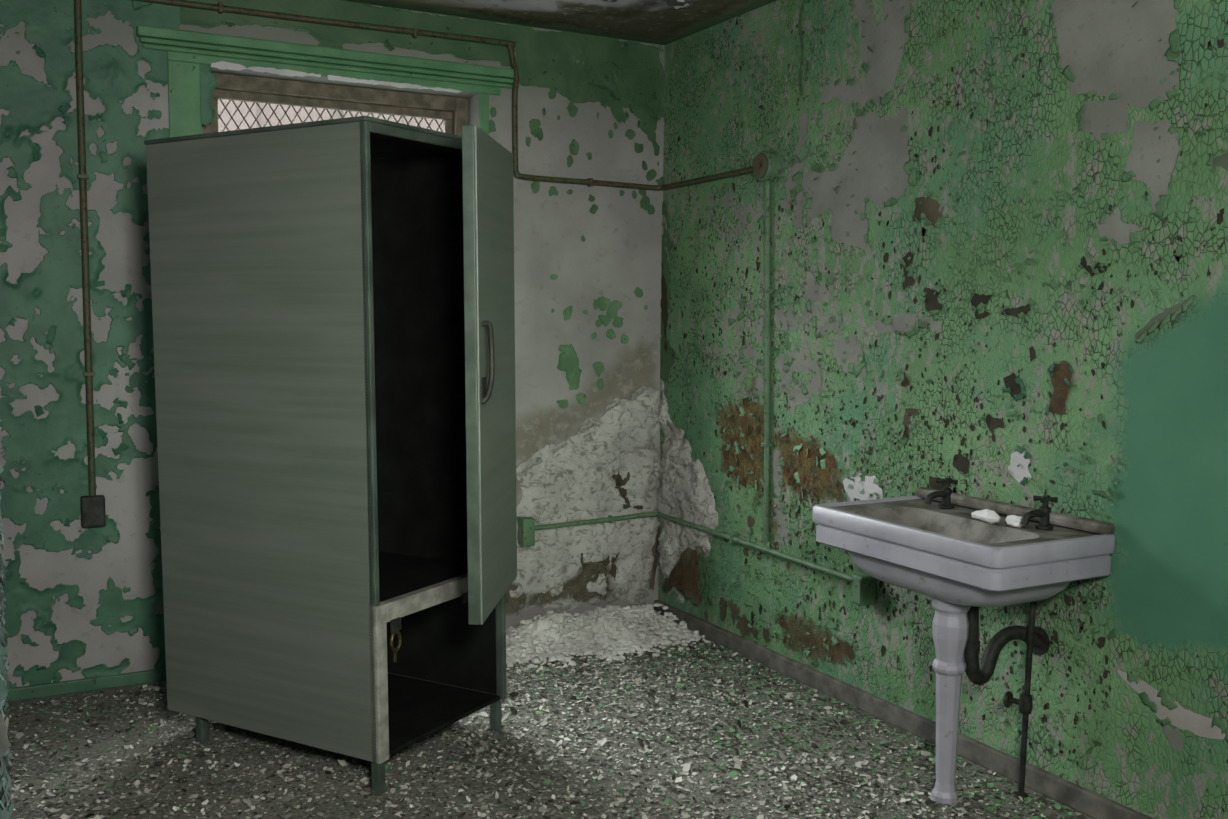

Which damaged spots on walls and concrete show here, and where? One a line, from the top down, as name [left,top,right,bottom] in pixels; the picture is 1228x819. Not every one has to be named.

peeling [0,0,702,819]
water stain [505,553,611,614]
spalling [858,581,931,663]
peeling [982,579,1228,771]